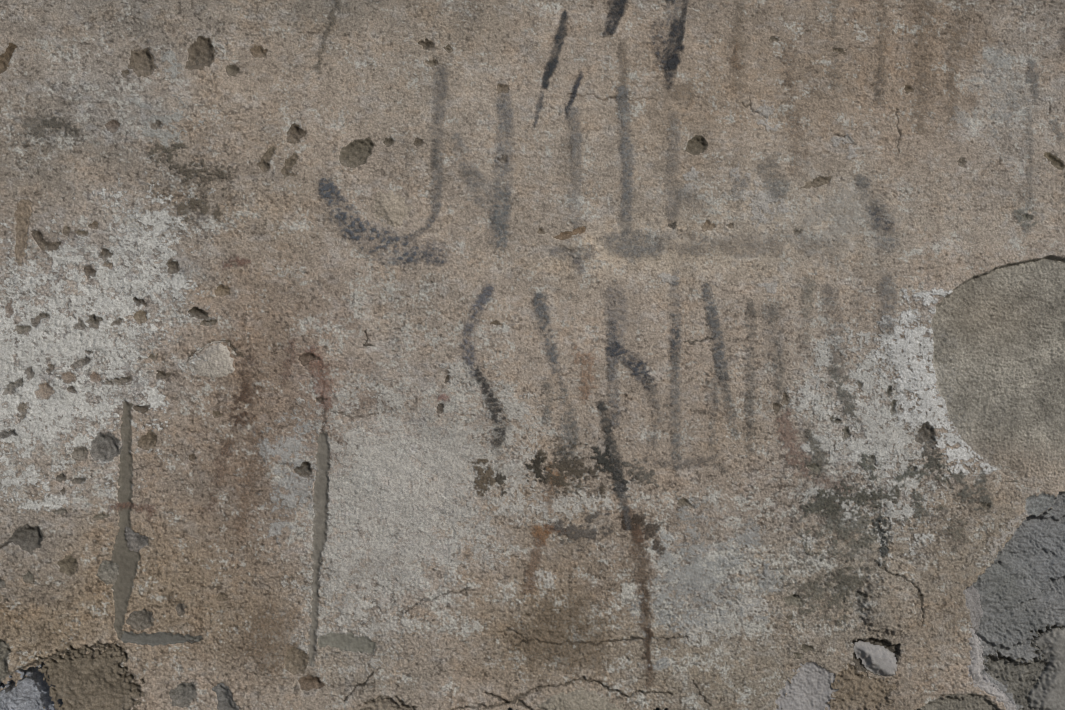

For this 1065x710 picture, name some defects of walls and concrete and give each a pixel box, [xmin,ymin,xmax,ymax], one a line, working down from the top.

spalling [916,491,1065,710]
spalling [0,640,146,710]
crack [452,676,670,710]
spalling [825,637,901,710]